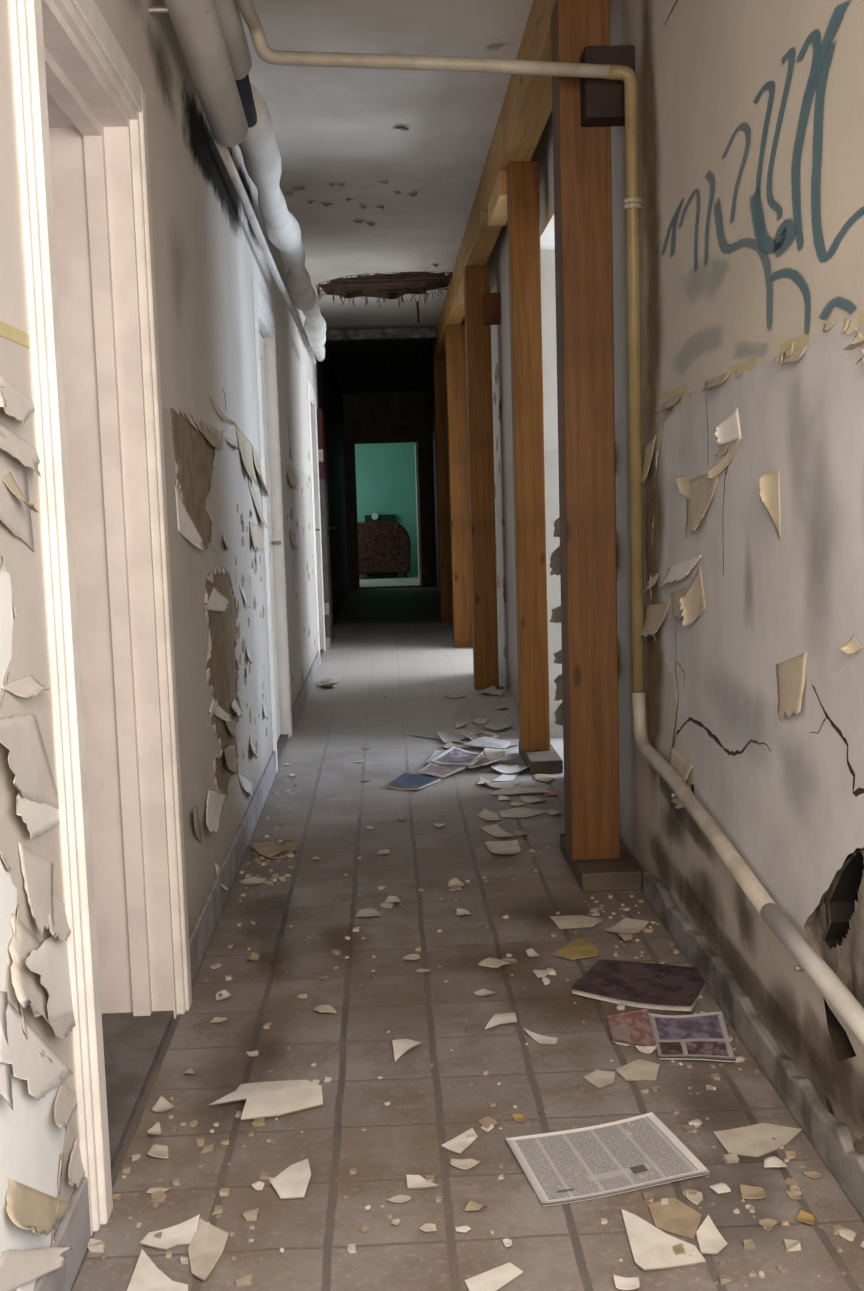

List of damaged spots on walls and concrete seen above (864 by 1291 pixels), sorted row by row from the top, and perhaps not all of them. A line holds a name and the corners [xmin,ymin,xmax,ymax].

flaking render [316,265,453,308]
peeling [0,376,41,552]
peeling [287,448,310,493]
peeling [170,396,269,843]
crack [672,661,771,757]
peeling [640,319,864,1008]
crack [810,685,864,797]
peeling [0,554,85,1291]